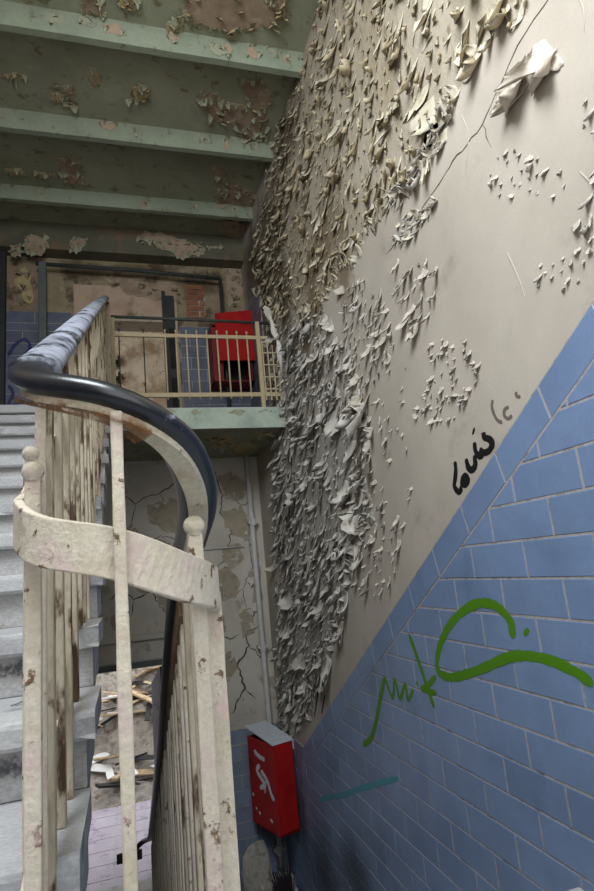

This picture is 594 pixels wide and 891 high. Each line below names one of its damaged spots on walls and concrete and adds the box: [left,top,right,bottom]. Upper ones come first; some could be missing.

peeling [78,0,125,36]
crack [414,0,548,219]
peeling [489,39,564,118]
peeling [487,148,562,198]
peeling [68,236,88,254]
peeling [532,171,594,292]
peeling [131,0,528,737]